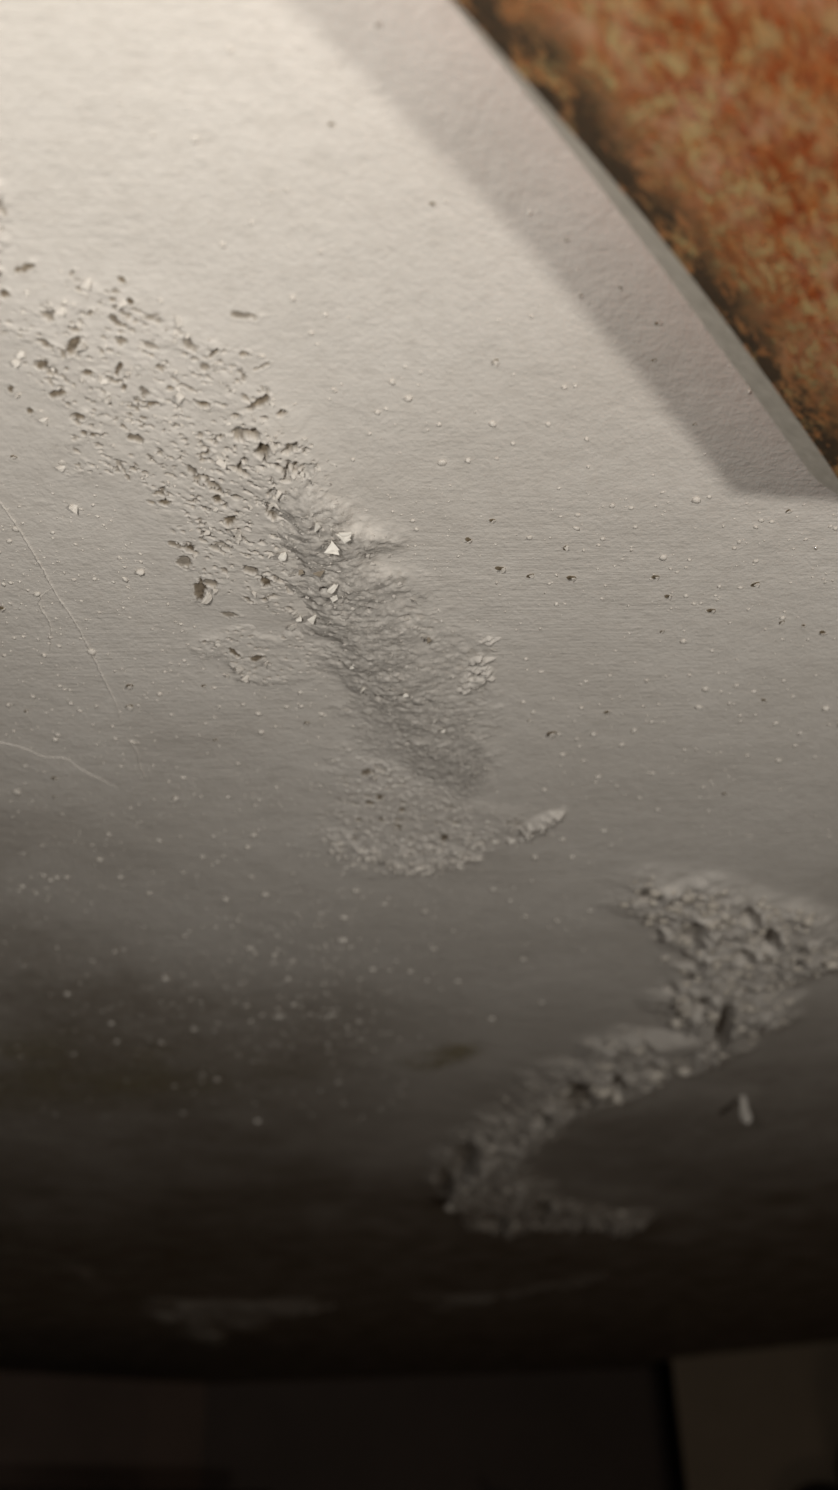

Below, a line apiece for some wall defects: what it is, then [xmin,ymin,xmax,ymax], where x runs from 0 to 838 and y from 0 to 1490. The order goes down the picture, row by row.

spalling [0,224,357,689]
spalling [288,735,570,883]
peeling [454,635,507,695]
spalling [410,859,838,1241]